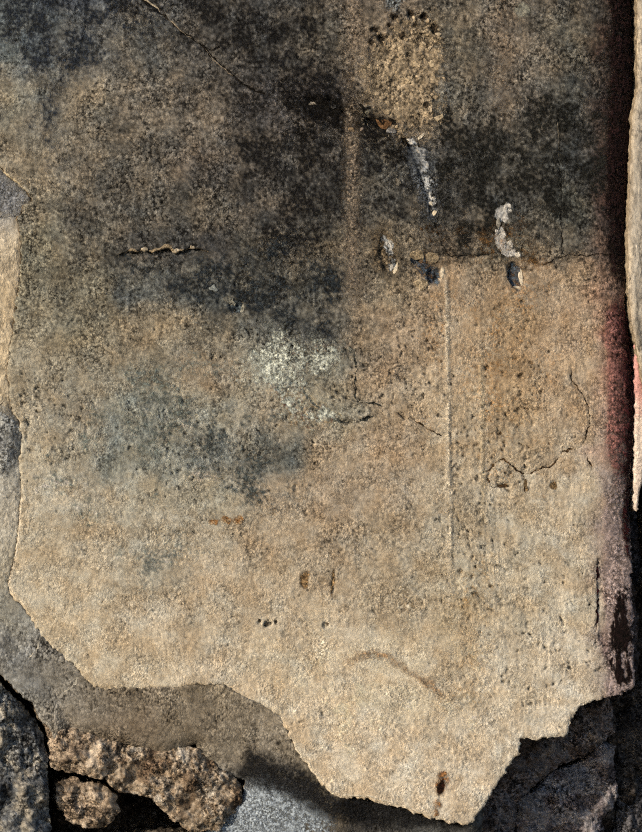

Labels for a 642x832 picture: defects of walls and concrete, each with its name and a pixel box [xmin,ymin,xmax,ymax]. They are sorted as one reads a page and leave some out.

damp [0,0,165,148]
crack [142,0,278,101]
spalling [359,10,445,216]
crack [118,244,208,256]
damp [119,0,627,422]
damp [444,280,453,571]
crack [487,369,592,492]